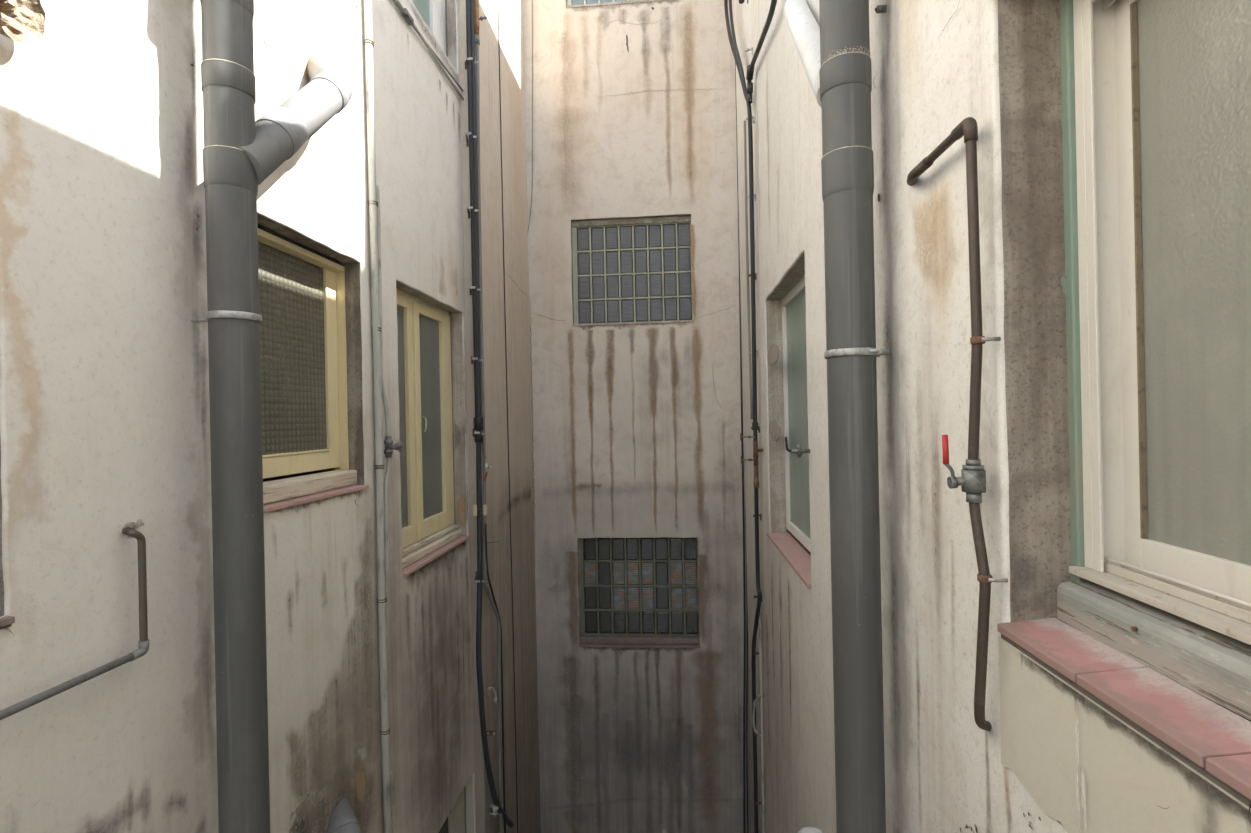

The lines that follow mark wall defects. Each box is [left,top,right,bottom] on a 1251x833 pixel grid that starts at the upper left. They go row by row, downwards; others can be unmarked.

spalling [0,0,46,43]
damp [115,0,174,26]